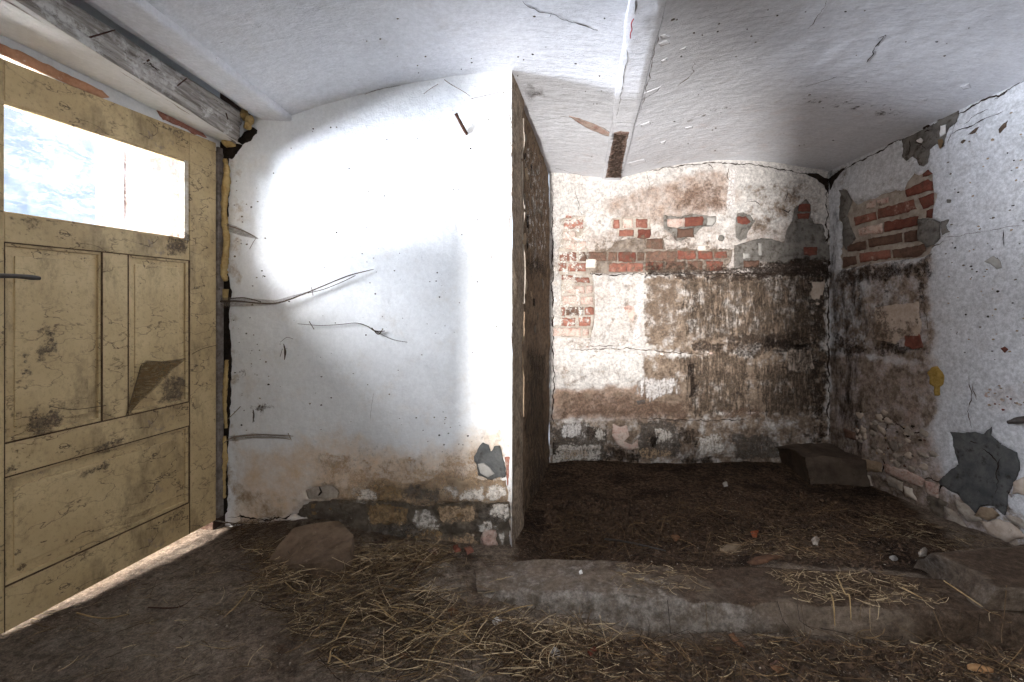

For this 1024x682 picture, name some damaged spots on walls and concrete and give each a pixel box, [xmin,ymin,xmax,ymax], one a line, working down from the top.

crack [550,181,705,440]
flaking render [352,88,1002,505]
water stain [561,254,934,464]
crack [590,82,1022,435]